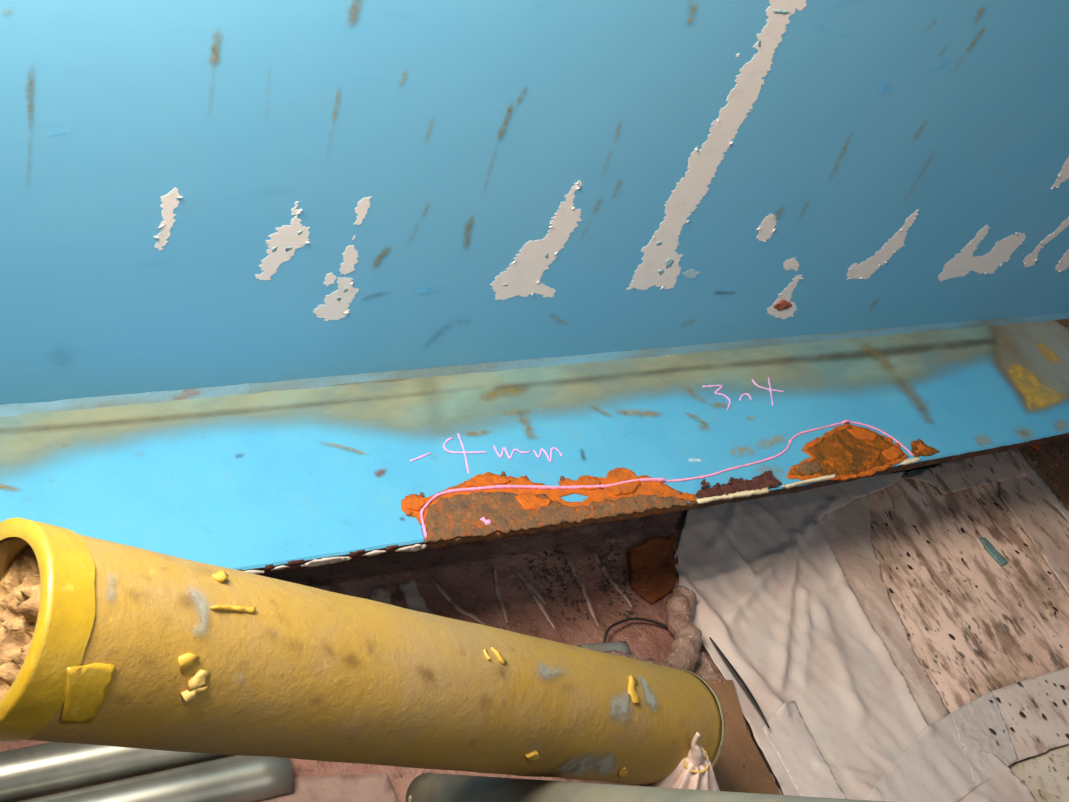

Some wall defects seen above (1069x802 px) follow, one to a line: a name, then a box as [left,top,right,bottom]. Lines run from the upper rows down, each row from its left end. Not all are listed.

peeling [626,0,807,290]
peeling [1051,157,1069,190]
peeling [153,187,183,251]
peeling [255,201,310,280]
peeling [313,196,372,321]
peeling [490,180,582,301]
peeling [847,209,919,280]
peeling [938,217,1069,282]
water stain [0,318,1069,468]
corrosion [401,422,940,549]
corrosion [264,559,305,574]
corrosion [348,549,365,561]